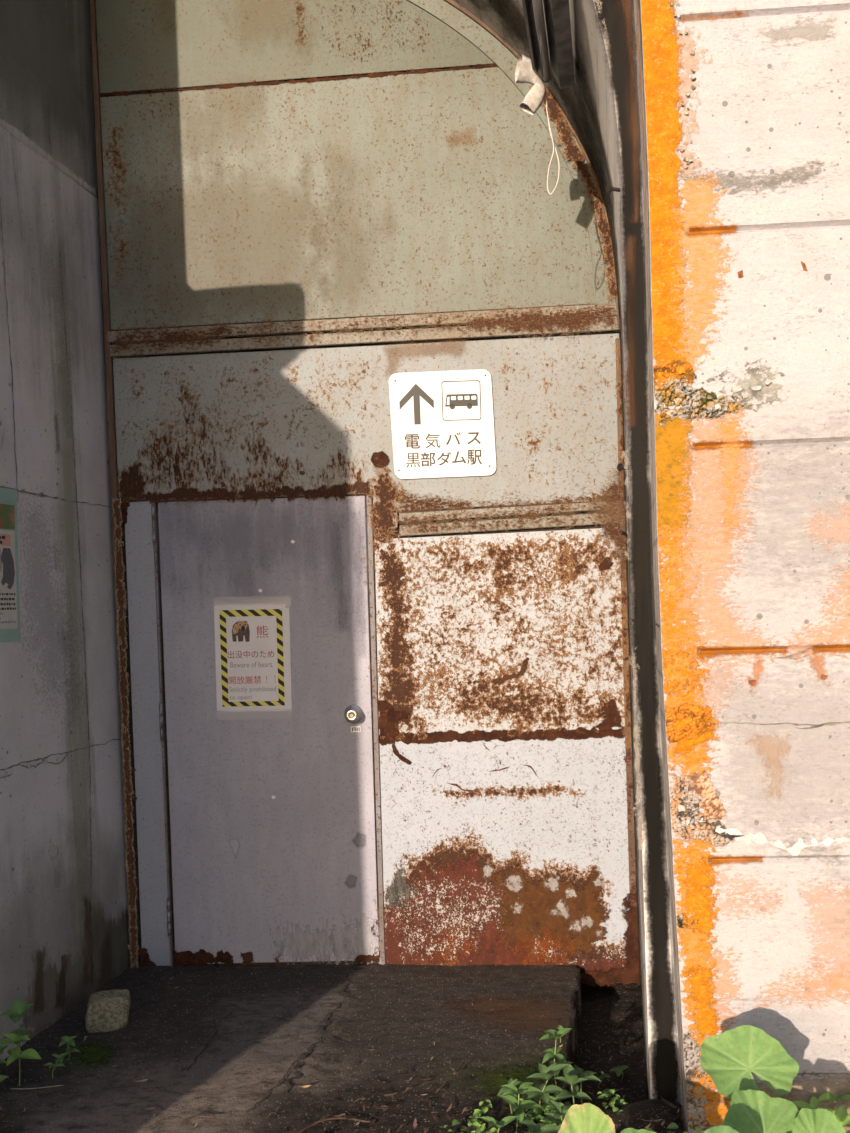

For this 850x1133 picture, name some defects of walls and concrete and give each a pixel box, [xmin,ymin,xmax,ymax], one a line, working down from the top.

leakage [470,0,530,55]
spalling [653,358,789,426]
corrosion [103,85,640,987]
leakage [538,0,680,1102]
crack [0,738,121,778]
leakage [353,833,365,847]
spalling [669,768,850,856]
leakage [23,898,130,1042]